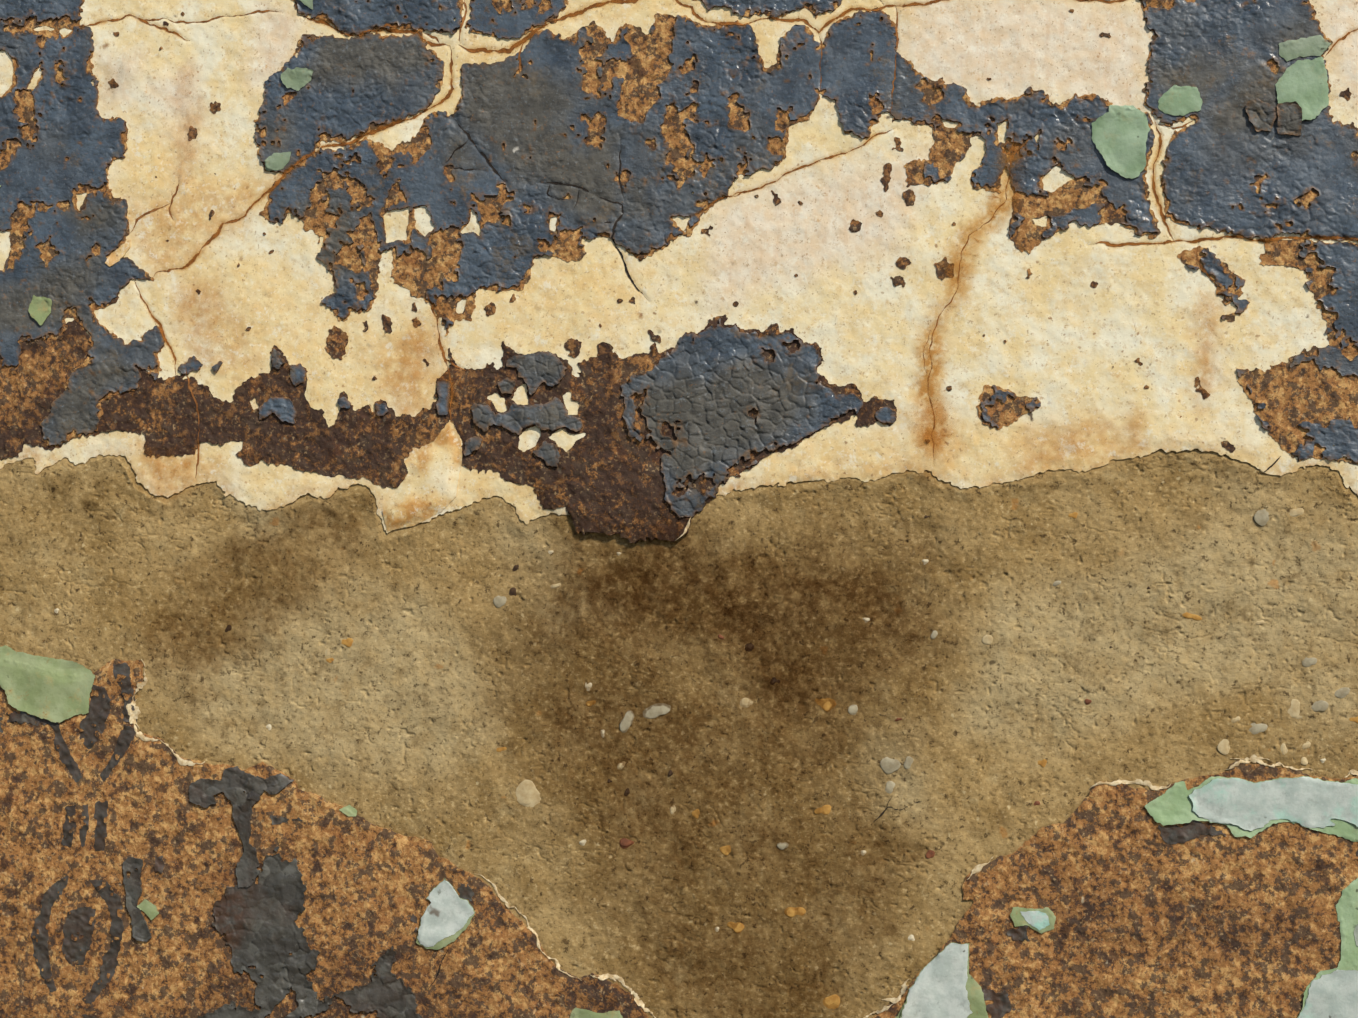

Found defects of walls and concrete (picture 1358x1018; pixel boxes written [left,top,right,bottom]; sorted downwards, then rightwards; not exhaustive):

peeling [0,0,166,447]
crack [86,0,648,475]
rust [0,314,897,543]
peeling [253,0,1358,465]
crack [676,0,941,215]
crack [923,132,1034,457]
crack [1078,0,1125,8]
crack [1089,114,1358,284]
crack [1326,29,1357,55]
spalling [0,318,1358,1018]
rust [0,659,649,1018]
rust [873,761,1358,1018]